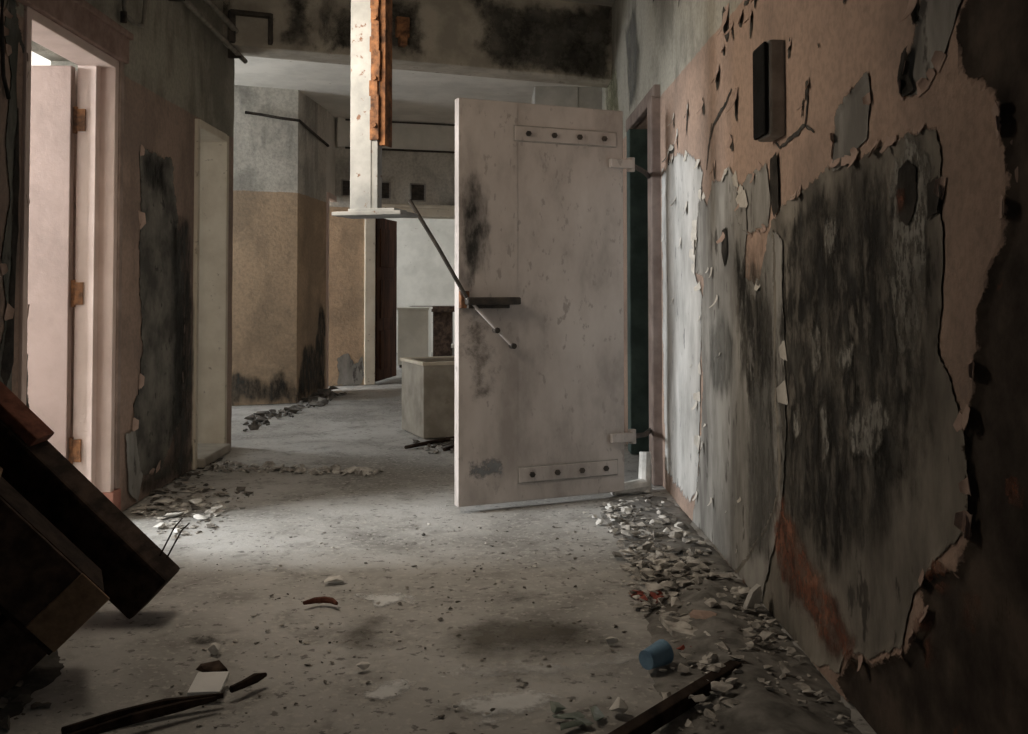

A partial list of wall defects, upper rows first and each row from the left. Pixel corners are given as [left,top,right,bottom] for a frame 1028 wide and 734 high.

leakage [282,0,306,43]
leakage [322,8,351,50]
leakage [392,2,420,52]
leakage [472,0,611,78]
crack [775,95,814,149]
spalling [661,0,1028,734]
leakage [736,137,931,661]